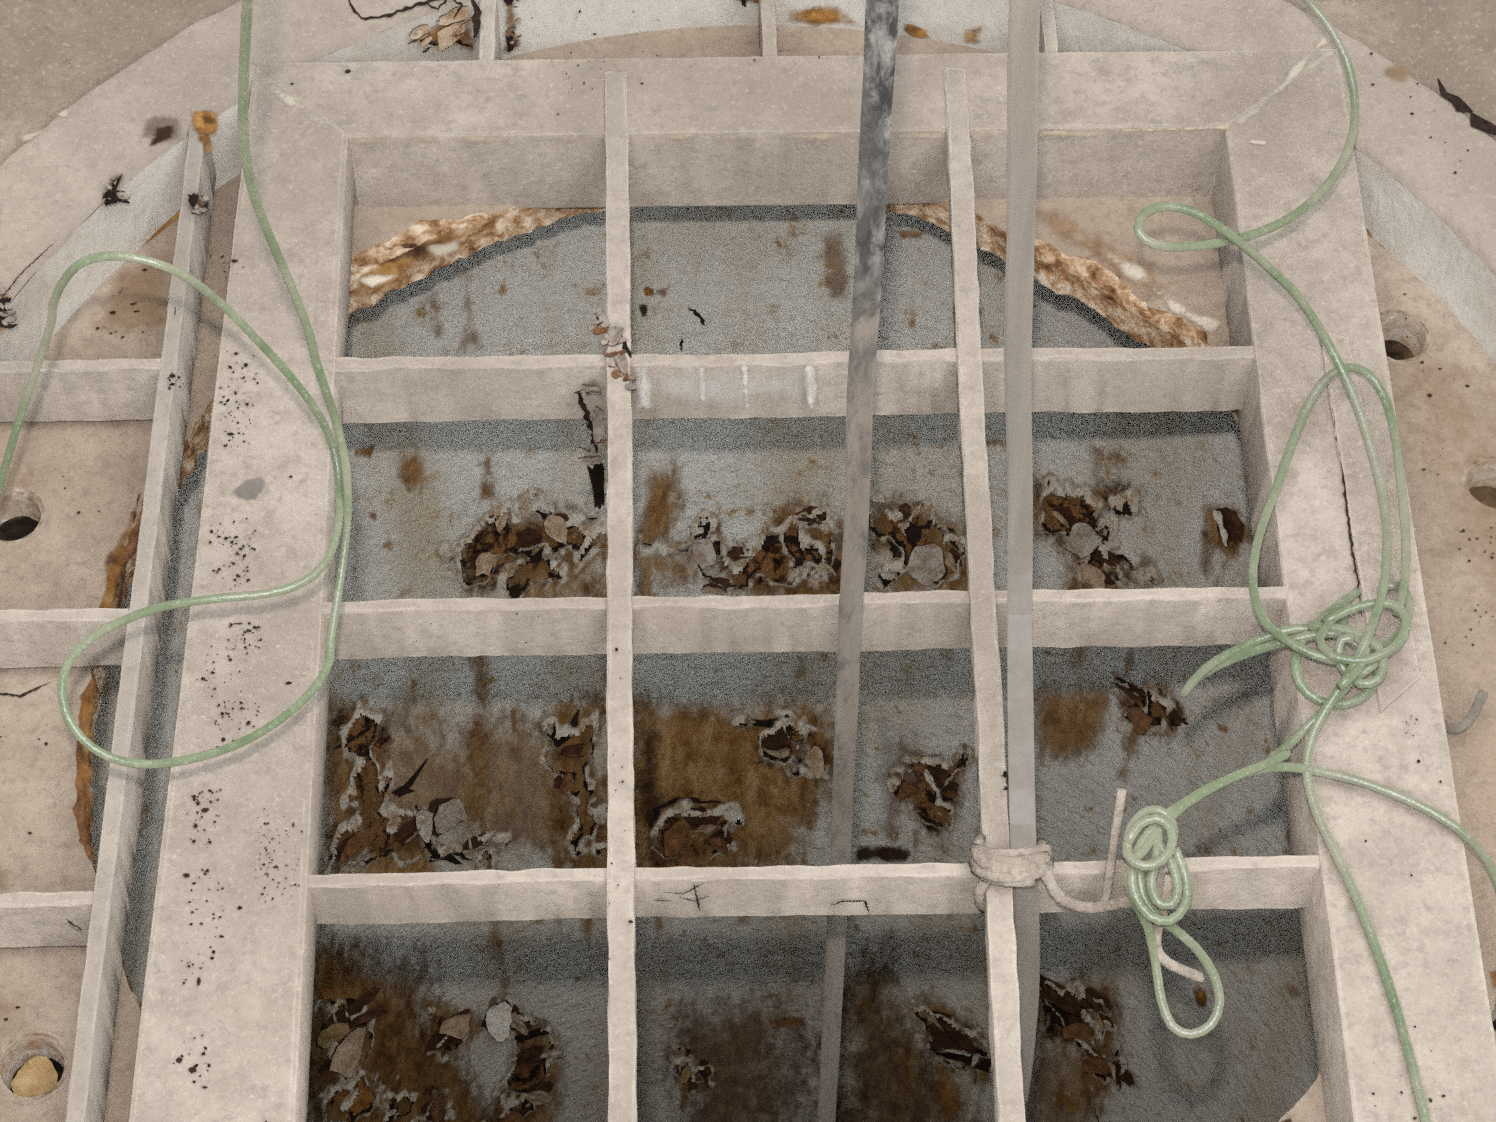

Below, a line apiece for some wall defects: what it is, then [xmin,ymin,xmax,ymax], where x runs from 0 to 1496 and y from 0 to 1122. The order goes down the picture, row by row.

crack [349,0,482,38]
rust [350,212,492,291]
rust [639,287,665,316]
rust [1034,239,1220,347]
peeling [438,309,636,614]
peeling [633,491,844,596]
peeling [868,489,967,593]
peeling [1033,472,1162,590]
rust [72,679,95,862]
peeling [319,697,512,875]
rust [633,696,835,868]
peeling [314,983,566,1122]